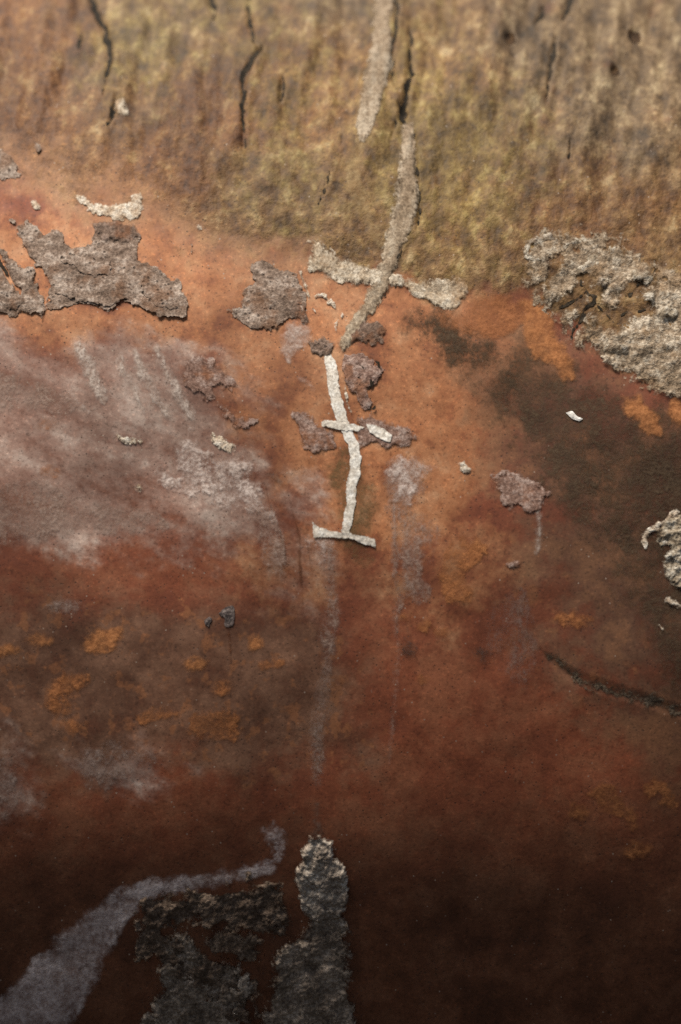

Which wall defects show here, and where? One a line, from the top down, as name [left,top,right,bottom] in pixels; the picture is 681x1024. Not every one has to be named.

crack [77,0,116,125]
crack [239,5,262,148]
flaking render [0,200,188,318]
spalling [522,227,681,397]
flaking render [342,321,417,448]
efflorescence [158,440,285,567]
rust [49,674,89,730]
rust [85,627,122,653]
crack [545,653,681,717]
efflorescence [215,833,282,880]
efflorescence [0,876,199,1024]
spalling [133,871,356,1024]